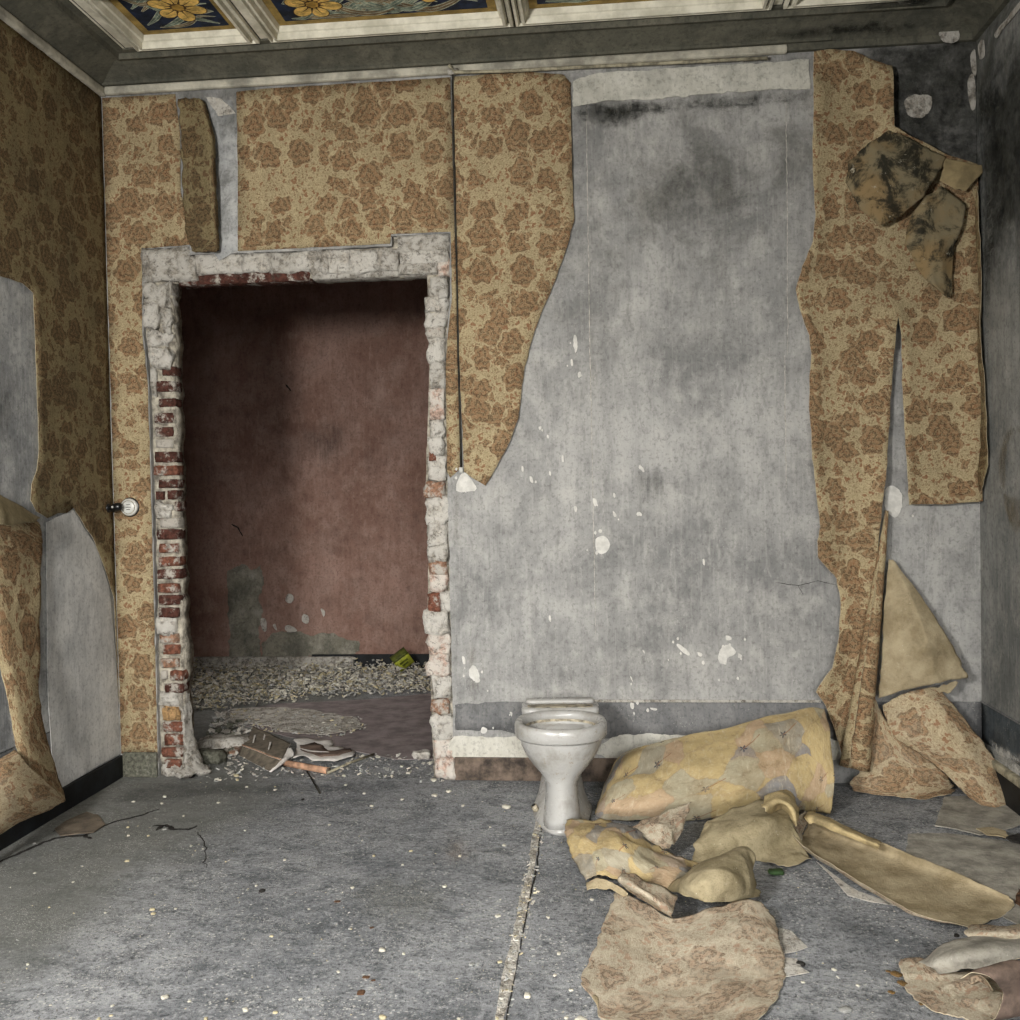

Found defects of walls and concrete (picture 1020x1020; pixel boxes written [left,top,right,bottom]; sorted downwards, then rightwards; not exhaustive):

peeling [967,2,1020,111]
flaking render [572,59,811,107]
leakage [580,108,642,121]
peeling [904,94,932,118]
leakage [873,41,1020,268]
flaking render [455,468,477,492]
flaking render [884,486,903,518]
flaking render [587,529,610,555]
flaking render [46,509,121,787]
peeling [850,559,1006,807]
flaking render [225,707,363,735]
flaking render [596,733,686,758]